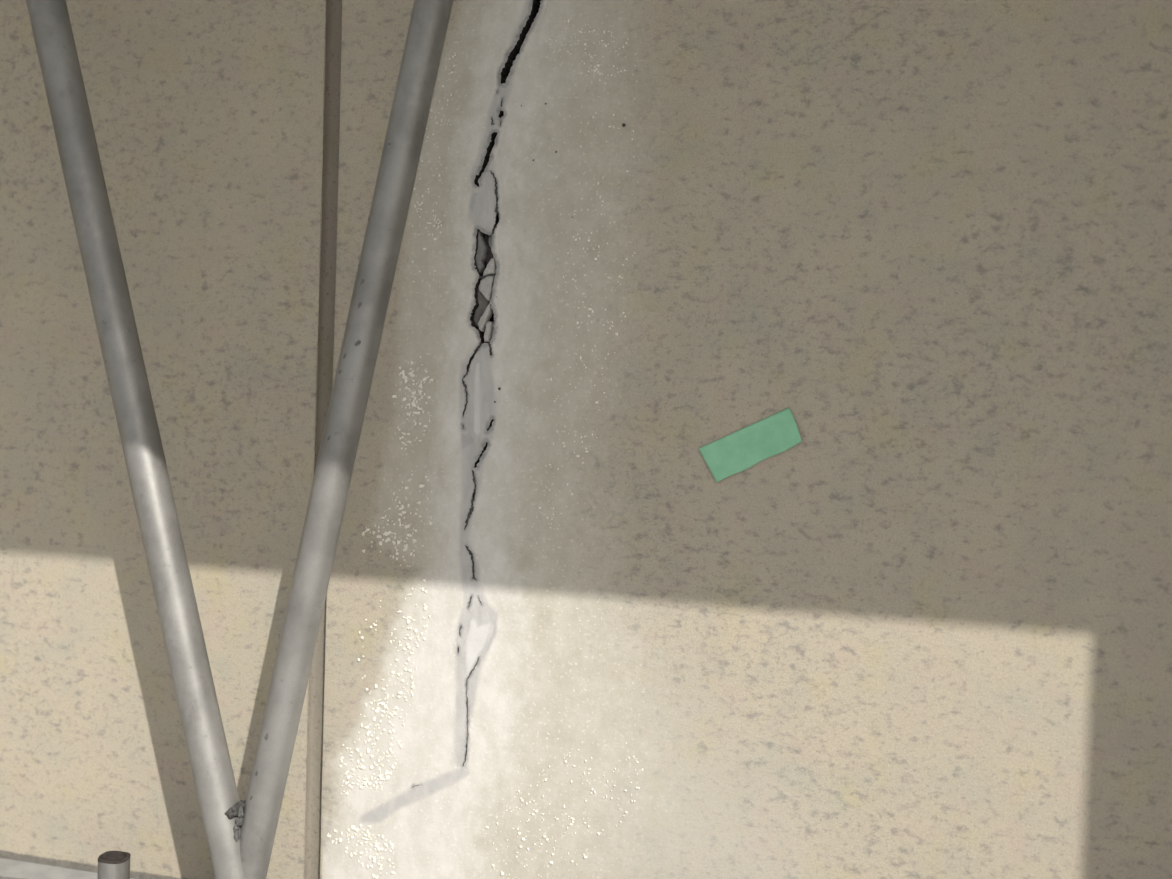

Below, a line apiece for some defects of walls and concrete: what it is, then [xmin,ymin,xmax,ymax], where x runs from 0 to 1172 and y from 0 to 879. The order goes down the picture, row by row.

crack [453,0,549,772]
crack [407,778,425,792]